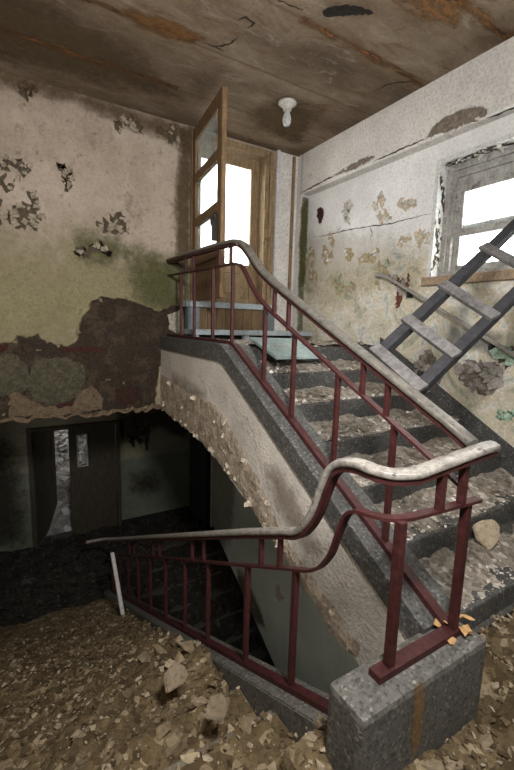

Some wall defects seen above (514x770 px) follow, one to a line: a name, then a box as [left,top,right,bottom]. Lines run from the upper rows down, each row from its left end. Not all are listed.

spalling [323,4,374,18]
damp [0,0,174,96]
rust [350,43,424,87]
damp [254,103,315,142]
flaking render [426,105,489,139]
peeling [0,153,47,232]
peeling [56,162,75,192]
damp [0,70,192,308]
peeling [73,212,130,259]
flaking render [316,207,325,224]
peeling [454,345,514,396]
flaking render [0,295,279,527]